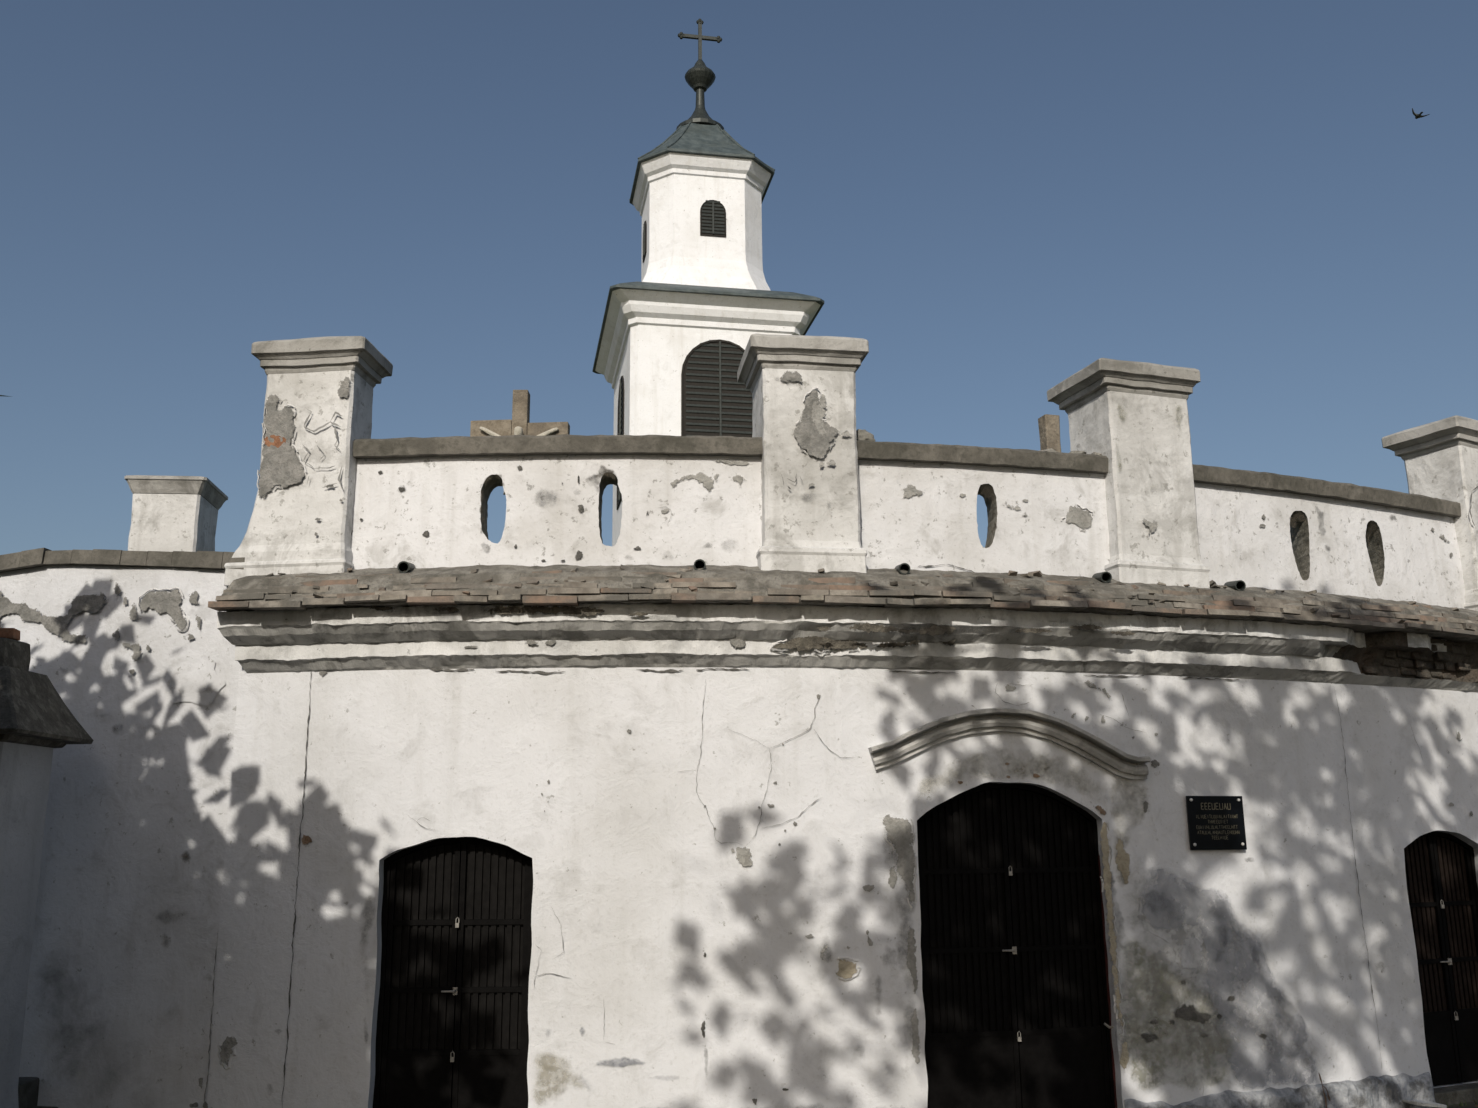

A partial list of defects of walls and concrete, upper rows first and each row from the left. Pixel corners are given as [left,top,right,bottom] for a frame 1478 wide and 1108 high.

spalling [257,394,307,498]
spalling [780,371,852,467]
flaking render [0,584,201,674]
crack [637,668,855,844]
crack [282,678,311,1095]
spalling [862,815,917,908]
spalling [906,929,921,1064]
spalling [1096,805,1235,1069]